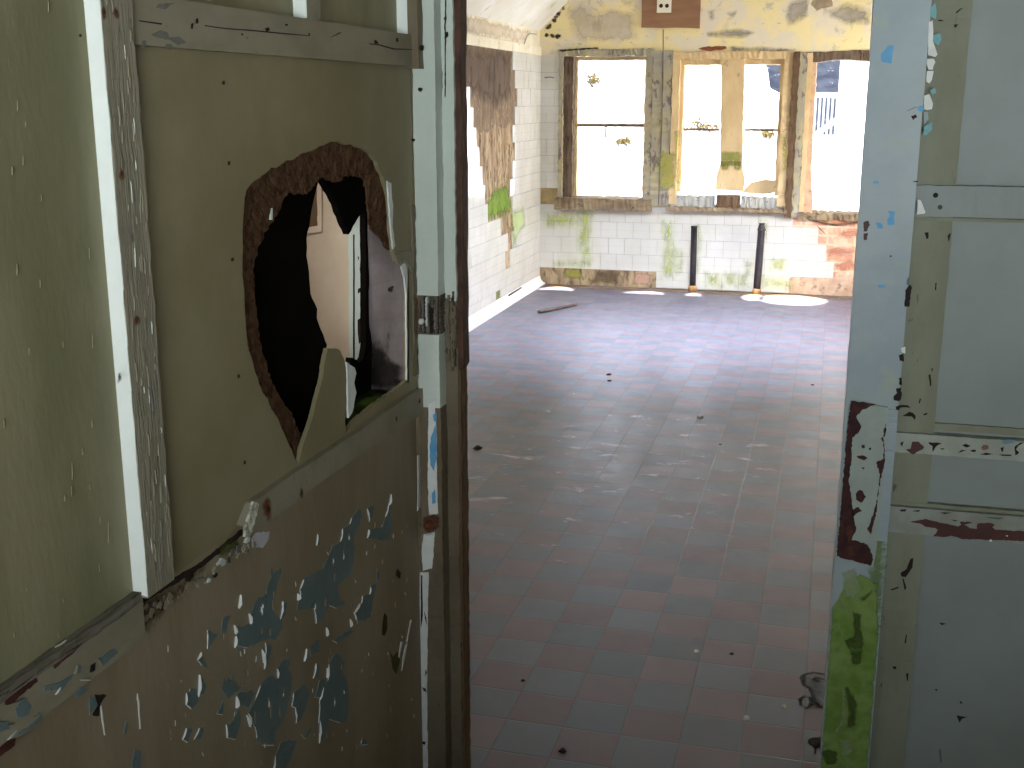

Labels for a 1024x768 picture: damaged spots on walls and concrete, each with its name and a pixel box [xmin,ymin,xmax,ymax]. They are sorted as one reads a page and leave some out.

peeling [907,4,942,135]
peeling [466,18,526,268]
water stain [660,153,675,188]
flaking render [783,210,895,296]
peeling [417,402,438,515]
corrosion [423,514,439,533]
peeling [900,509,1024,542]
peeling [143,529,270,624]
peeling [167,494,435,768]
water stain [845,613,863,664]
peeling [0,640,117,756]
water stain [845,688,857,727]